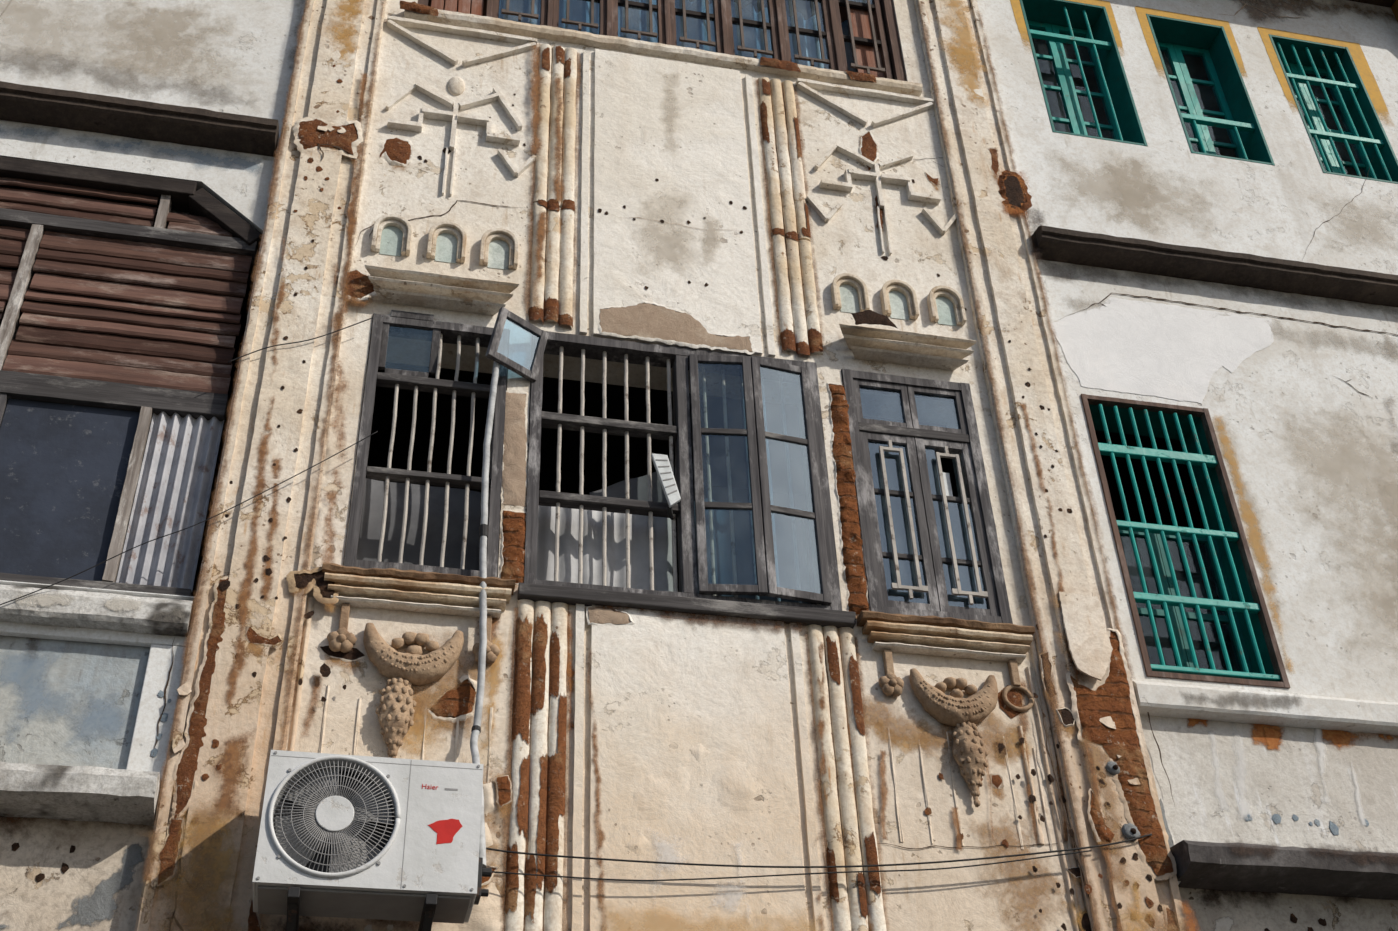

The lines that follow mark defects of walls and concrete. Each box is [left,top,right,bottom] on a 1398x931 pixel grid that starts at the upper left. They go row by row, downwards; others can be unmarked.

spalling [292,110,428,191]
spalling [989,148,1032,211]
crack [1302,157,1374,260]
peeling [598,286,755,354]
peeling [1050,297,1274,404]
spalling [826,383,870,619]
spalling [254,555,340,619]
spalling [826,636,865,736]
spalling [58,576,241,929]
spalling [481,614,567,924]
spalling [998,592,1181,931]
spalling [826,848,839,904]